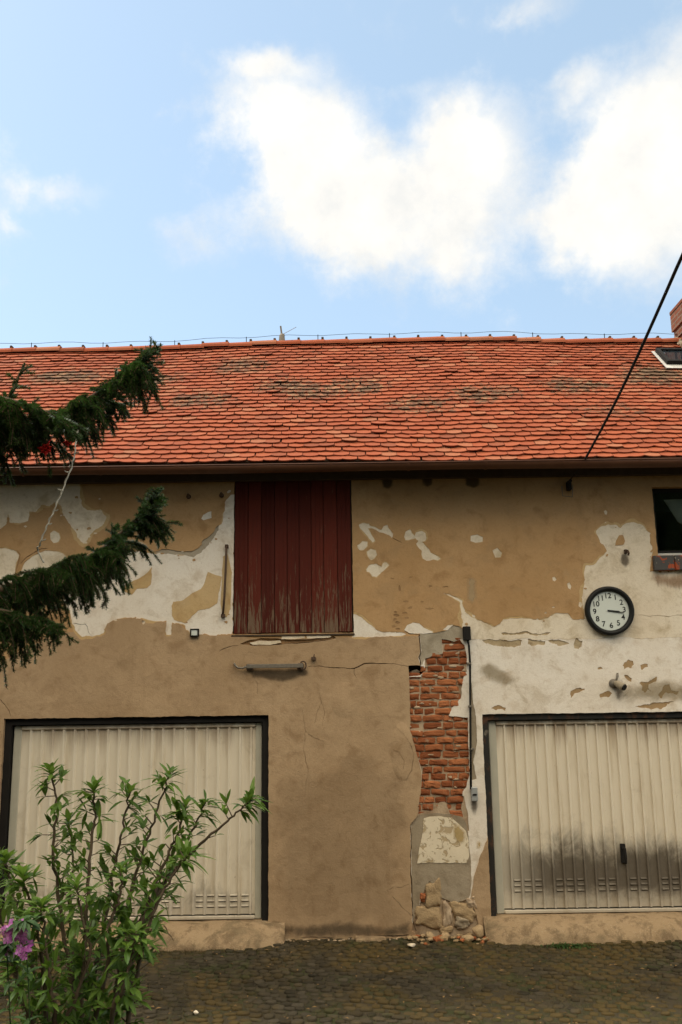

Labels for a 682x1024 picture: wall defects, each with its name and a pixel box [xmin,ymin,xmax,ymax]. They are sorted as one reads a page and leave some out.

flaking render [0,484,110,601]
flaking render [61,490,235,640]
crack [220,631,421,675]
flaking render [351,510,682,938]